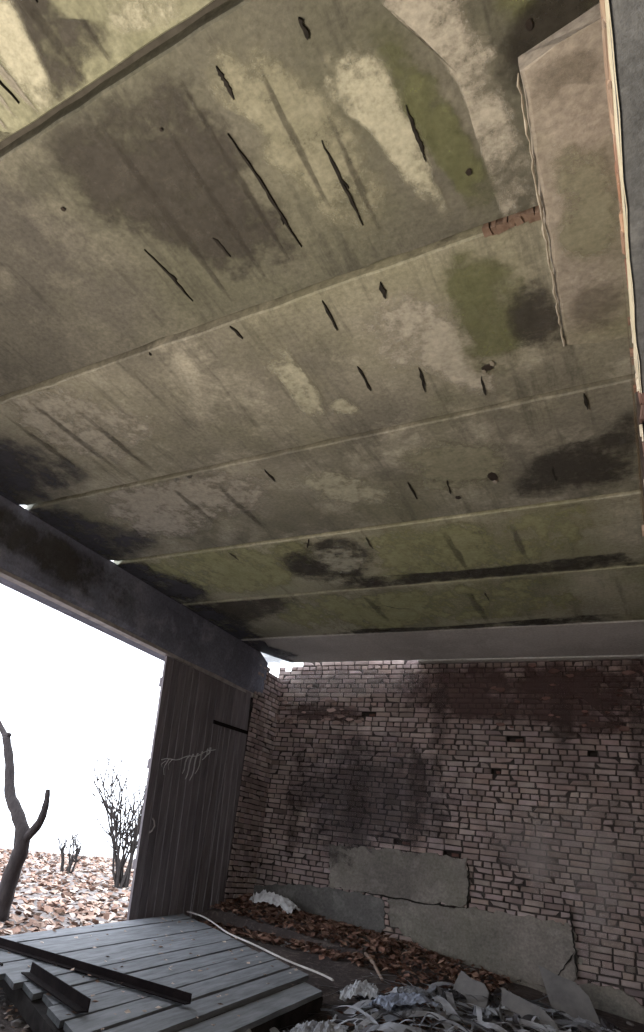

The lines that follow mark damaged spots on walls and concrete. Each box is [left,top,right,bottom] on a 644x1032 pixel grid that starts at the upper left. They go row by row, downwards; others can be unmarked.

crack [0,80,20,104]
damp [0,0,102,107]
damp [385,0,598,168]
damp [56,85,293,269]
crack [227,133,302,248]
crack [321,140,363,226]
crack [144,249,193,302]
damp [508,288,562,343]
damp [517,417,637,496]
damp [284,539,634,588]